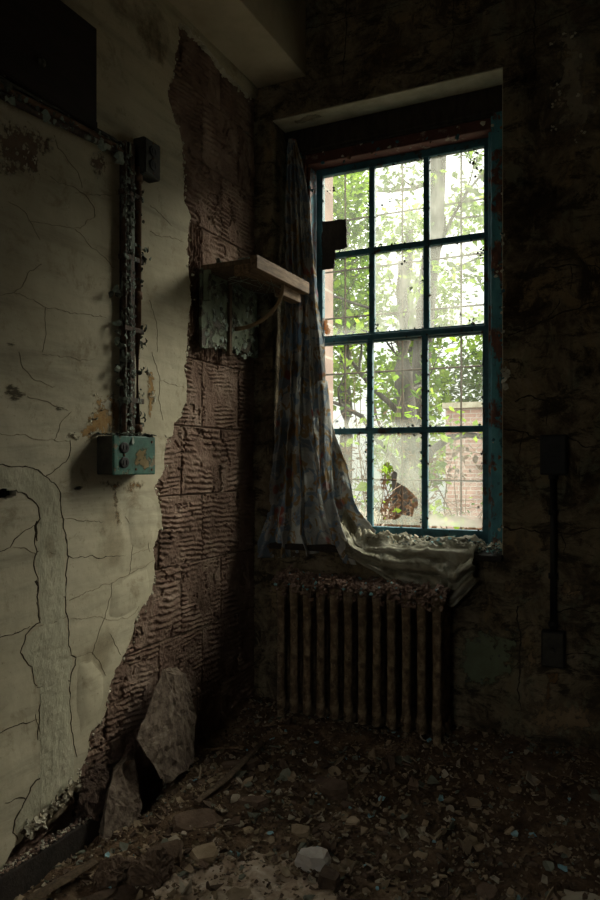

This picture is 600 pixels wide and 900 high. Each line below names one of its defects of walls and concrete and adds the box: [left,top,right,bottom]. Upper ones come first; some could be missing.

crack [0,264,152,756]
spalling [3,20,256,868]
crack [150,302,177,418]
crack [8,778,40,839]